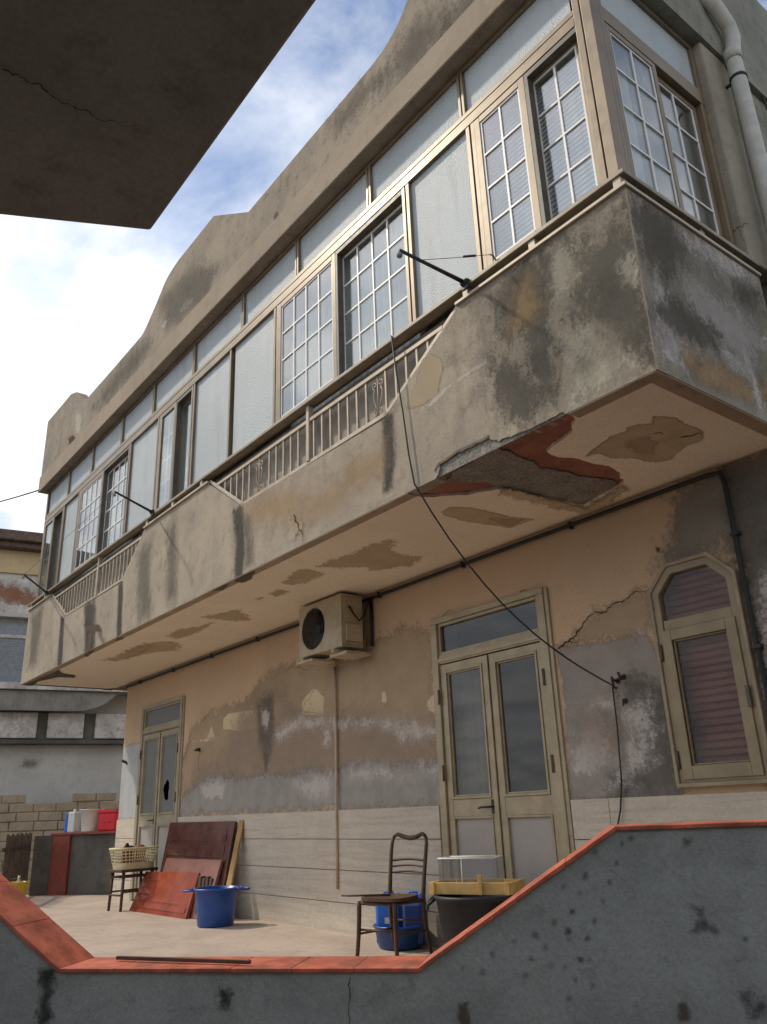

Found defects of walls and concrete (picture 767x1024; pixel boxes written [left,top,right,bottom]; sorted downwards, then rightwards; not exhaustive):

crack [2,68,138,127]
damp [489,195,767,424]
damp [382,413,394,491]
spalling [425,412,704,514]
damp [233,505,245,577]
crack [292,515,304,540]
peeling [257,539,422,601]
peeling [443,507,534,528]
peeling [85,610,252,661]
crack [558,587,652,650]
peeling [181,624,438,797]
damp [197,692,436,782]